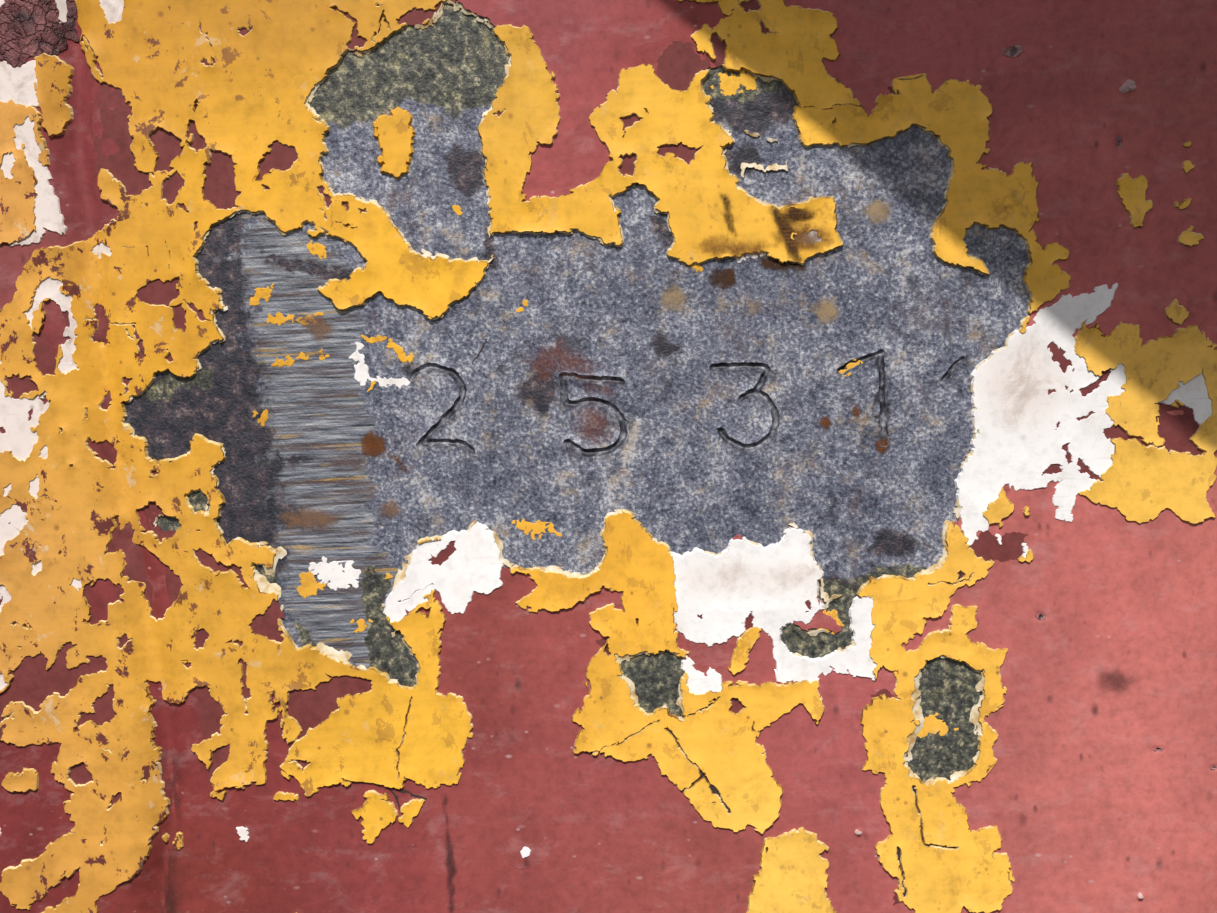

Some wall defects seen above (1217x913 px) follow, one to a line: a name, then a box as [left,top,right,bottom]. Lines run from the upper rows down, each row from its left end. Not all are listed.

peeling [477,0,1071,334]
peeling [1116,173,1153,229]
peeling [0,0,490,913]
rust [361,432,406,470]
rust [876,439,889,453]
peeling [1042,299,1217,524]
peeling [805,600,845,635]
crack [351,698,427,810]
crack [586,699,730,813]
peeling [510,509,837,913]
peeling [857,487,1034,913]
crack [897,785,957,897]